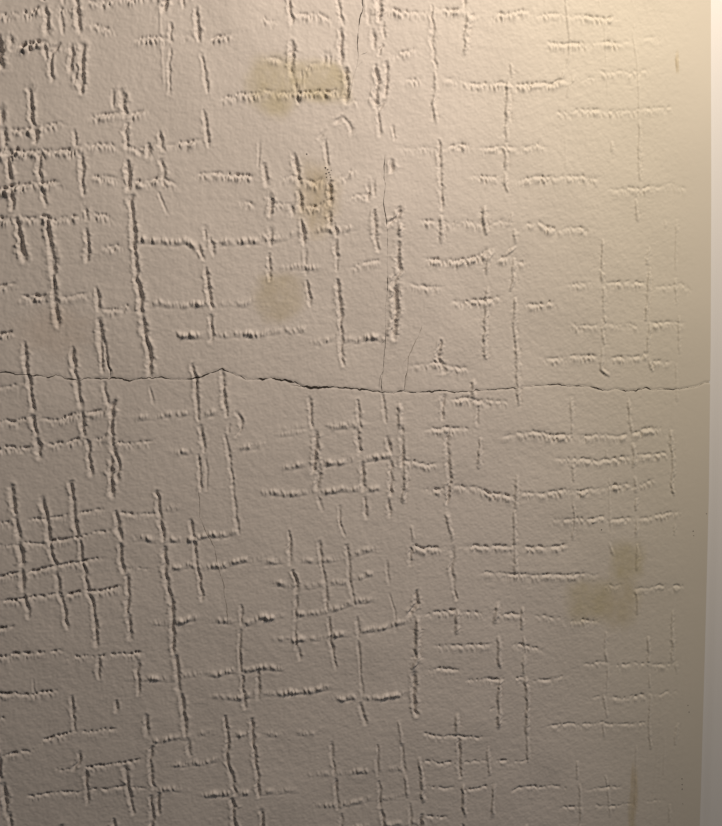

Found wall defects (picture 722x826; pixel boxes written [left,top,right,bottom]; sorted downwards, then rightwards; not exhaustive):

crack [0,354,169,382]
crack [190,328,692,393]